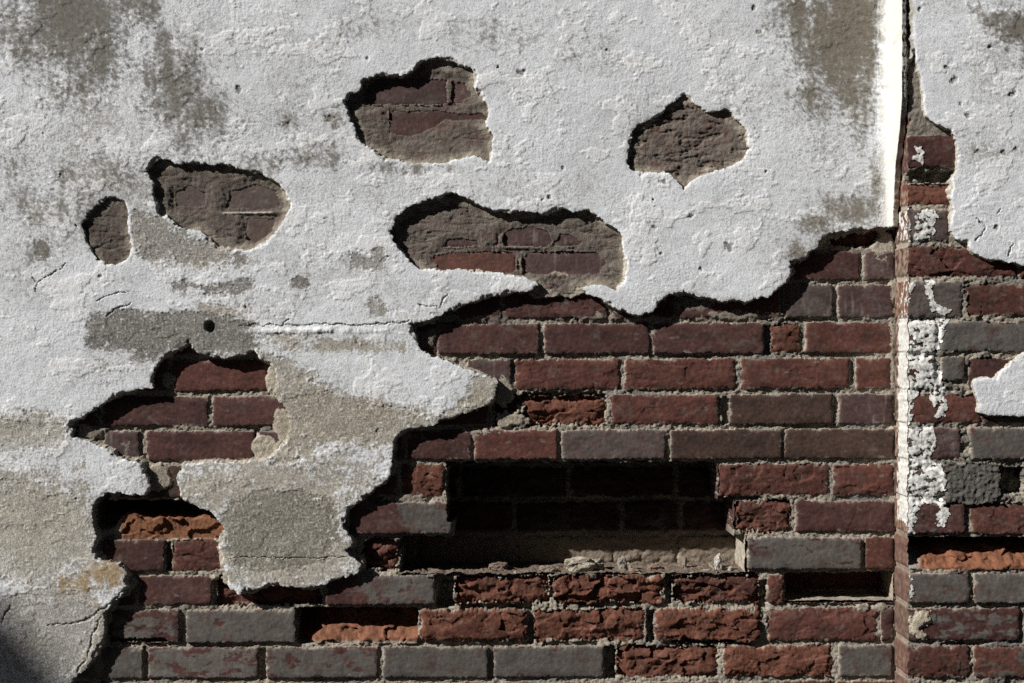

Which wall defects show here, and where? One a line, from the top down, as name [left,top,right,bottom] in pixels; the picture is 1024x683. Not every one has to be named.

flaking render [345,56,494,164]
flaking render [626,94,750,190]
damp [762,0,880,146]
flaking render [81,159,291,297]
damp [789,165,880,259]
crack [240,293,449,328]
spalling [777,47,1024,604]
spalling [0,192,893,683]